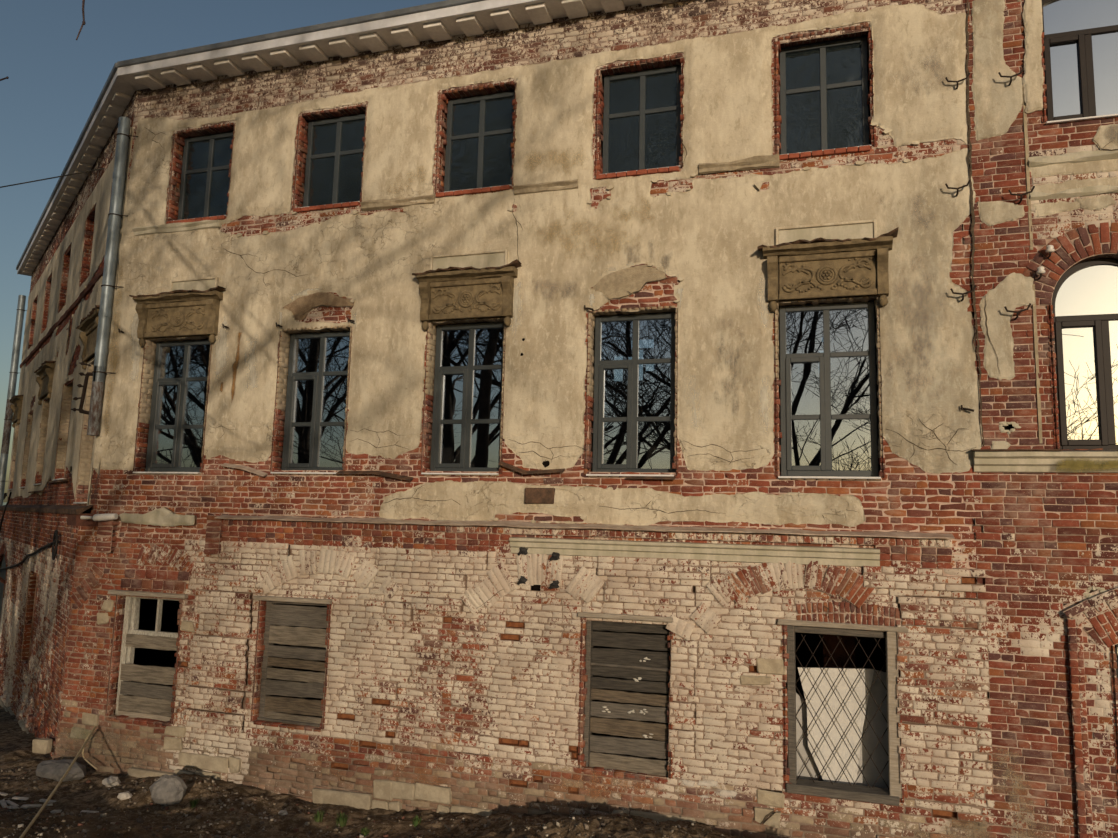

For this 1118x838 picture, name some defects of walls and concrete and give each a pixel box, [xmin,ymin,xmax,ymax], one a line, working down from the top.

spalling [587,178,614,209]
crack [887,0,1000,465]
spalling [587,264,684,314]
corrosion [220,333,241,400]
crack [509,439,584,461]
crack [685,441,763,463]
spalling [492,512,587,529]
spalling [962,577,985,585]
spalling [500,621,525,641]
spalling [337,713,355,721]
spalling [499,738,530,747]
spalling [932,809,979,830]